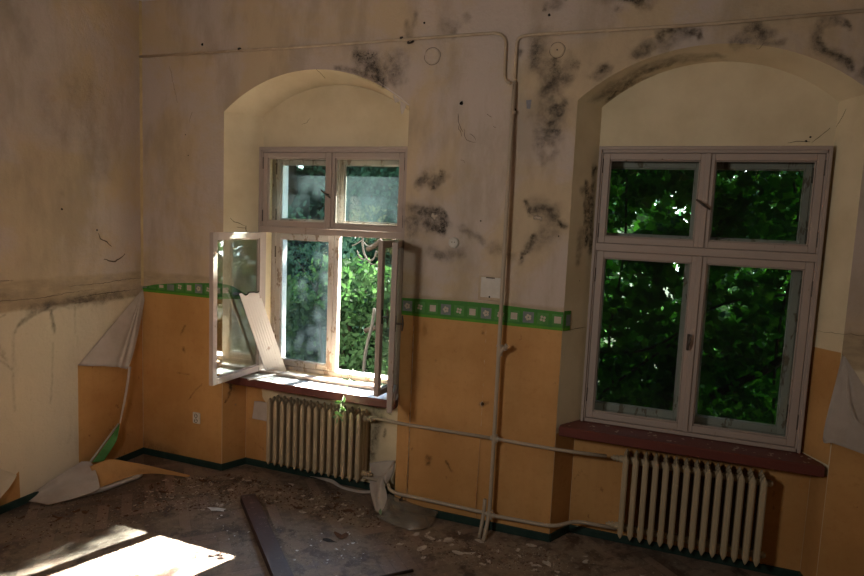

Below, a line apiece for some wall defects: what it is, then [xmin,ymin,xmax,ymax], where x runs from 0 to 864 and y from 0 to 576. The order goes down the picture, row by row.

peeling [78,290,145,463]
peeling [823,355,864,454]